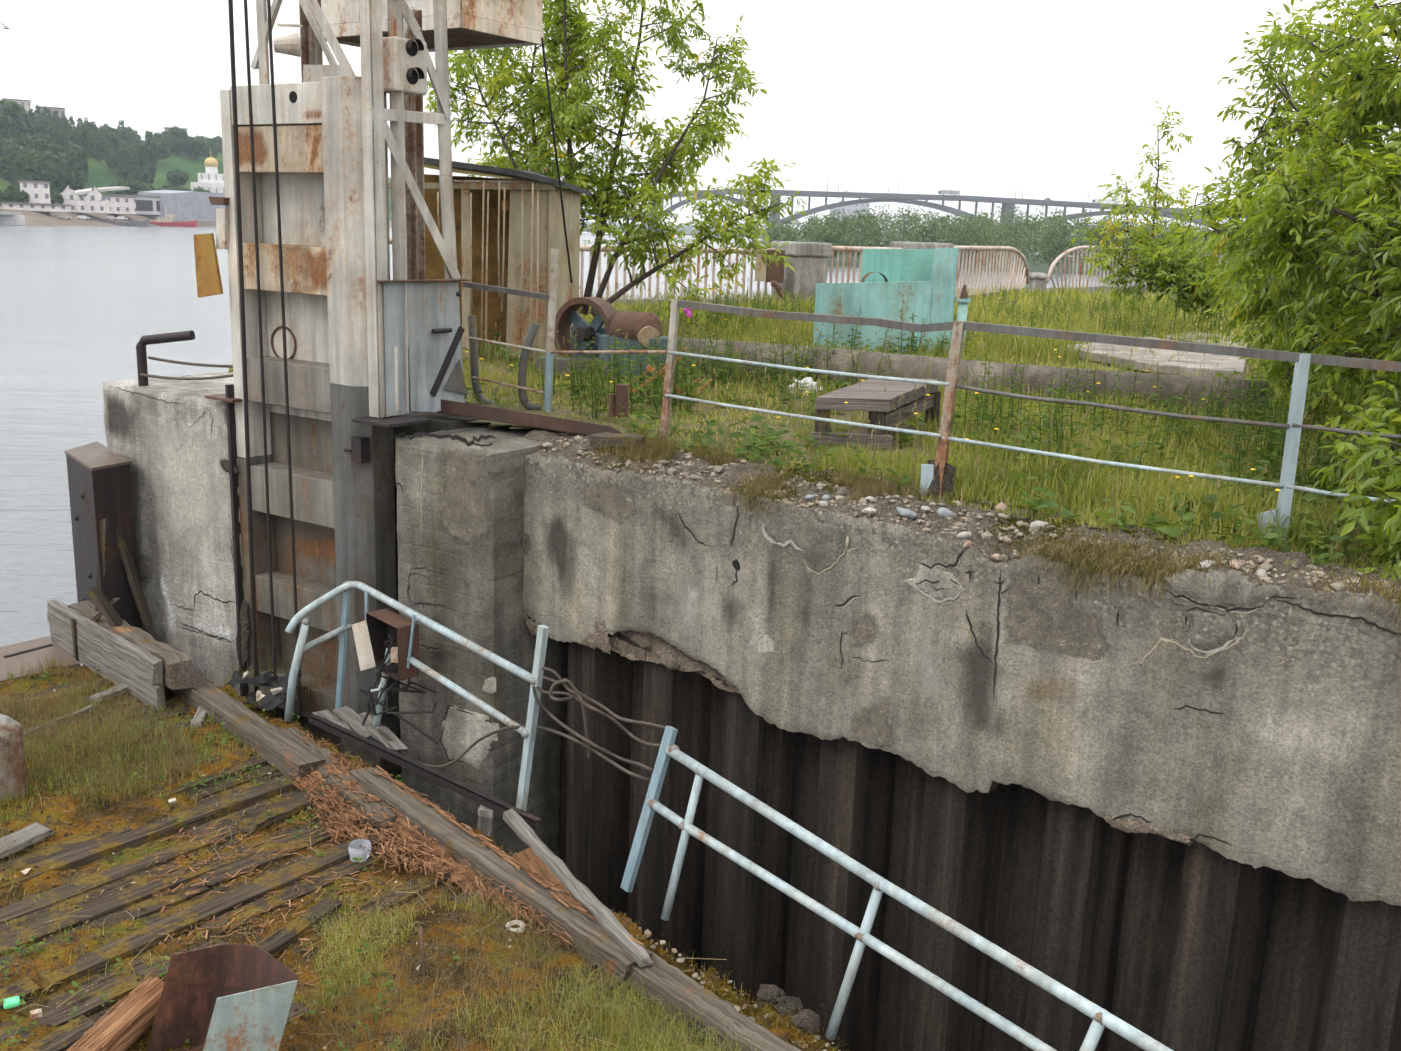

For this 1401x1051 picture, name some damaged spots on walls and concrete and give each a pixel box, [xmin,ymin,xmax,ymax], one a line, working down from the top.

corrosion [238,132,267,165]
corrosion [308,253,327,287]
leakage [549,519,568,580]
crack [716,505,740,586]
spalling [579,620,740,693]
crack [835,595,887,669]
crack [919,547,1012,704]
leakage [966,647,992,724]
crack [1064,590,1297,666]
crack [1174,705,1225,714]